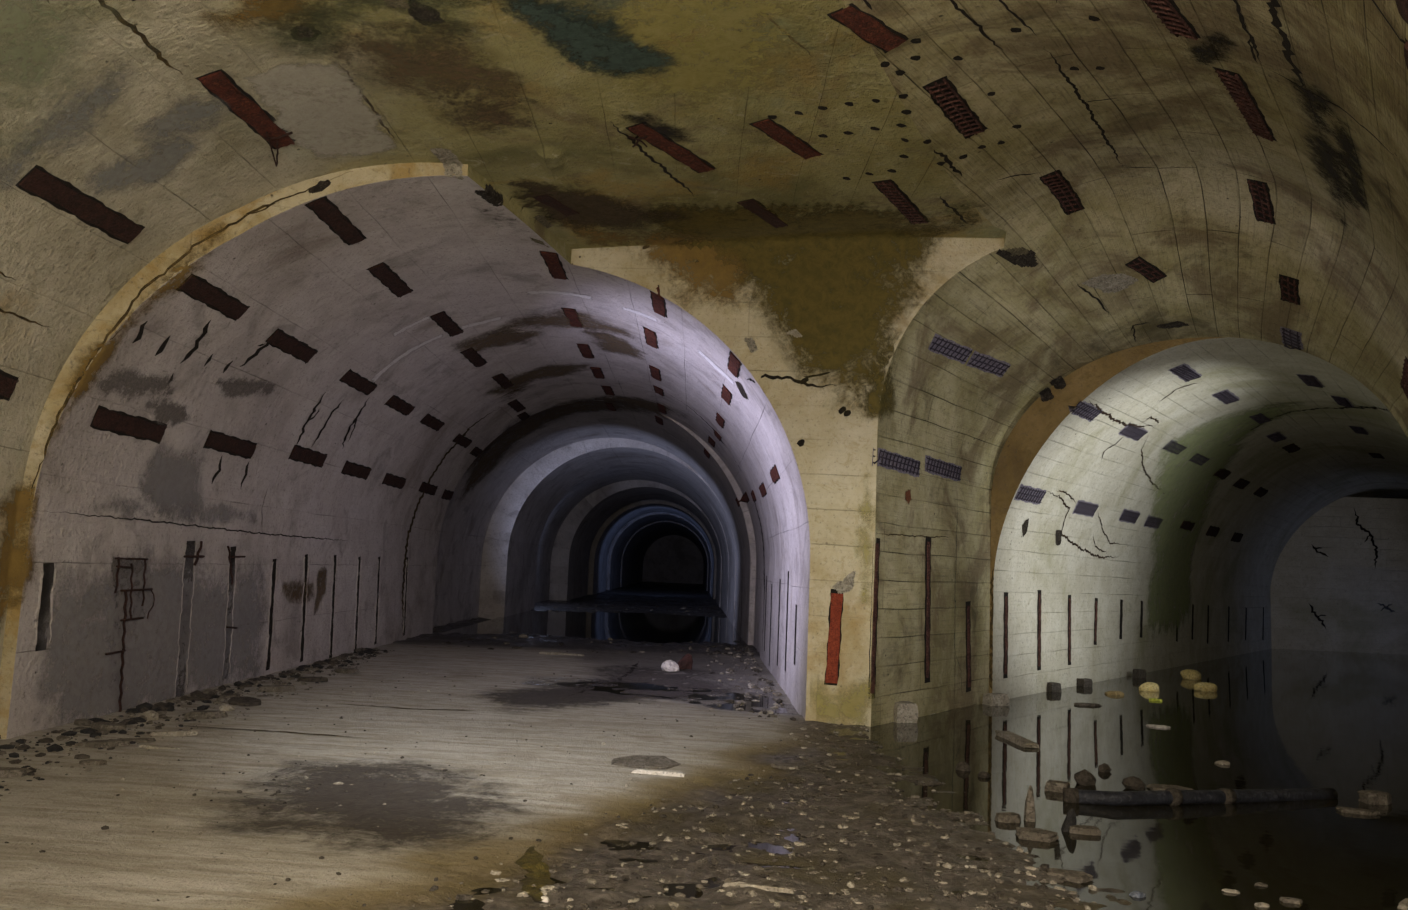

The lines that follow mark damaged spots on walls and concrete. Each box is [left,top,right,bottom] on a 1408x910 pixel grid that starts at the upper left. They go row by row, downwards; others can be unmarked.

crack [98,0,183,75]
leakage [271,0,537,132]
leakage [503,0,791,103]
leakage [1189,32,1237,65]
leakage [1290,78,1368,227]
leakage [484,179,982,418]
crack [28,171,353,541]
crack [296,392,370,449]
crack [1048,490,1116,559]